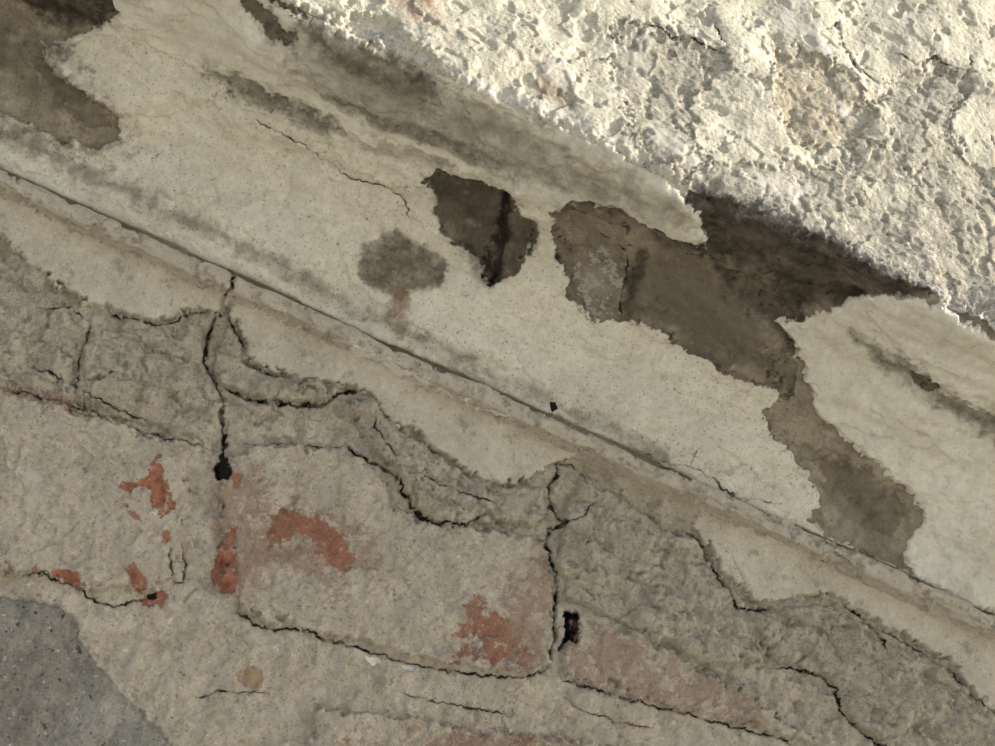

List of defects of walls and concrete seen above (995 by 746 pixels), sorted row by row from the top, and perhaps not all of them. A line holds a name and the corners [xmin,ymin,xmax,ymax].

peeling [0,0,709,287]
leakage [358,233,446,316]
peeling [548,16,995,615]
crack [16,276,492,526]
peeling [117,452,176,520]
crack [636,449,735,497]
peeling [32,565,87,591]
crack [25,570,135,608]
peeling [126,562,169,607]
peeling [211,509,355,594]
crack [237,464,790,745]
crack [778,667,887,746]